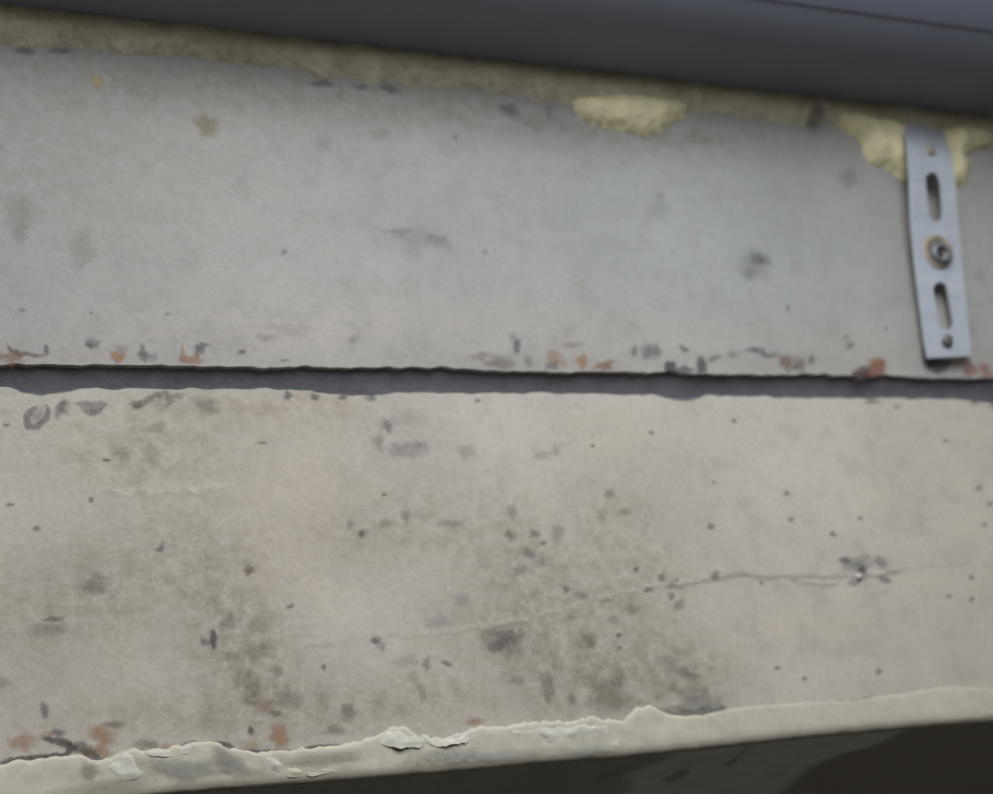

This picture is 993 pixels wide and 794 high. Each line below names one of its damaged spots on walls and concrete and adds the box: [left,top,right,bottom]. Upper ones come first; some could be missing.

corrosion [853,360,885,379]
flaking render [0,686,993,794]